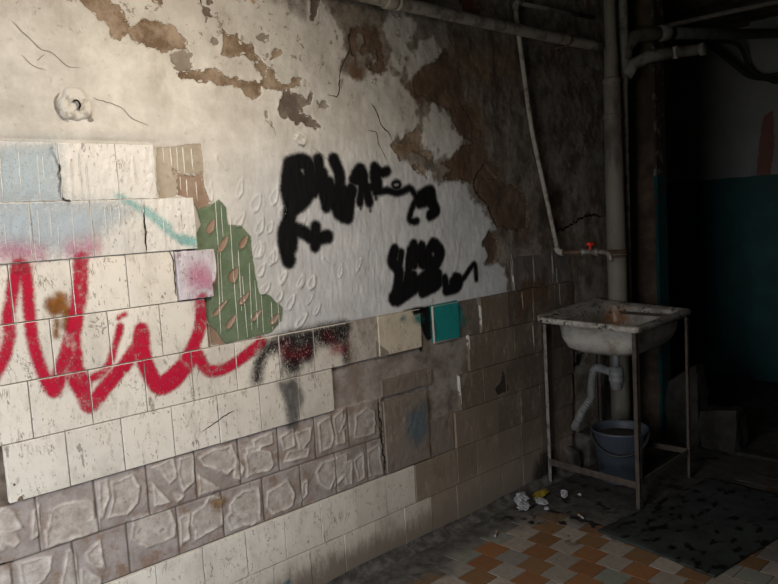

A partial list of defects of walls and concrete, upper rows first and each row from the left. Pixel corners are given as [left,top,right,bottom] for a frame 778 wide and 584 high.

flaking render [80,0,329,130]
flaking render [348,26,388,75]
flaking render [390,128,431,178]
flaking render [412,49,529,265]
crack [556,213,603,233]
spalling [0,446,23,507]